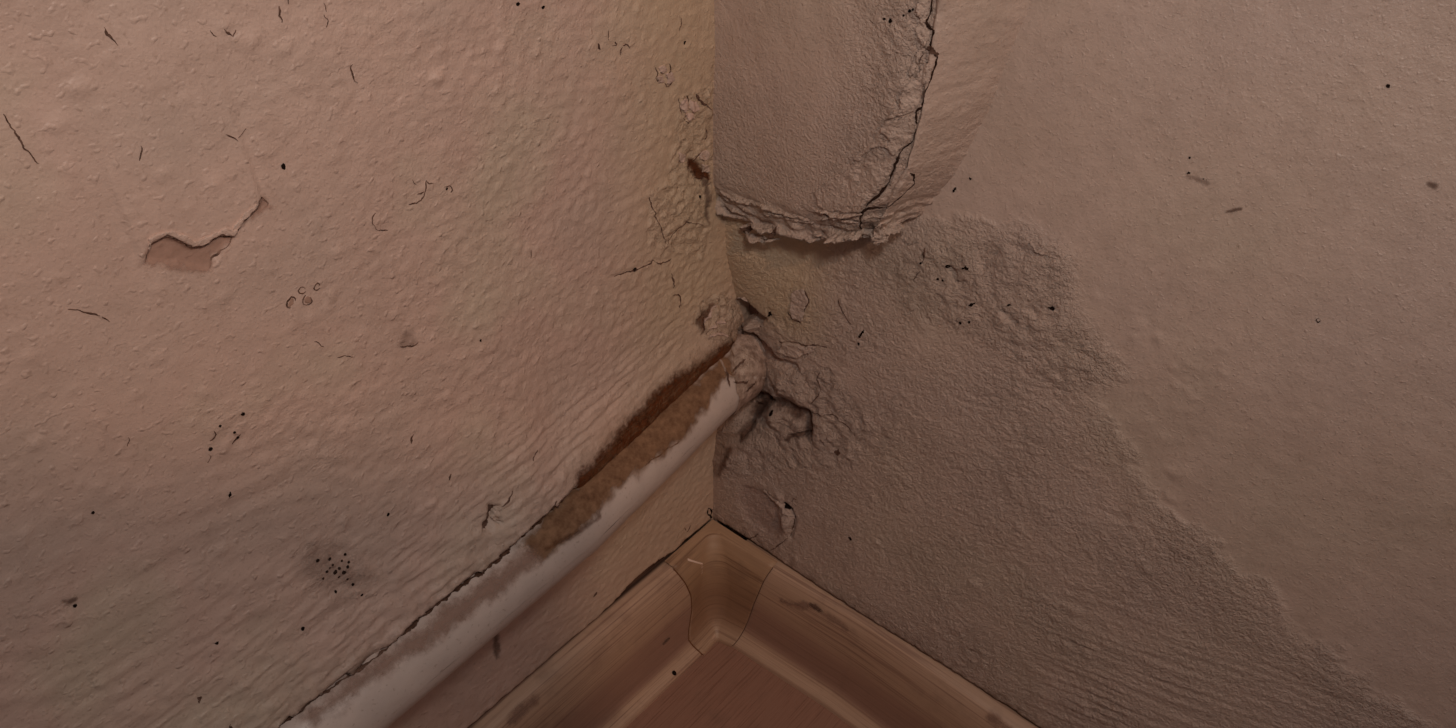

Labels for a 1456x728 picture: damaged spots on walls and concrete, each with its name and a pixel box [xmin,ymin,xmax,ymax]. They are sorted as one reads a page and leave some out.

peeling [145,197,269,271]
flaking render [719,0,934,244]
crack [859,0,939,239]